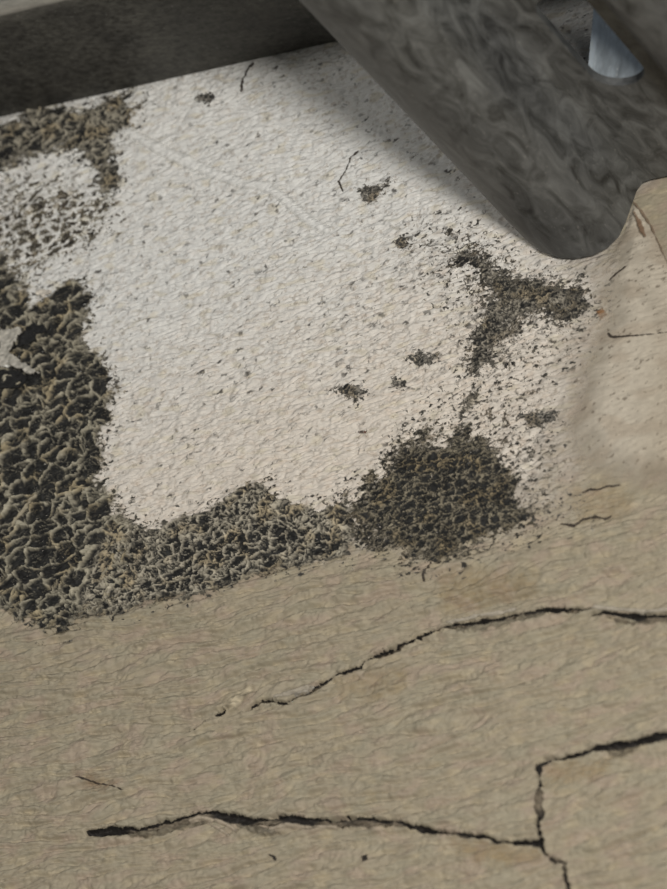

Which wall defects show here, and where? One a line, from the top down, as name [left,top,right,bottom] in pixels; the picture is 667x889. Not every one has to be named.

leakage [0,87,614,646]
crack [251,605,667,710]
crack [87,732,667,889]